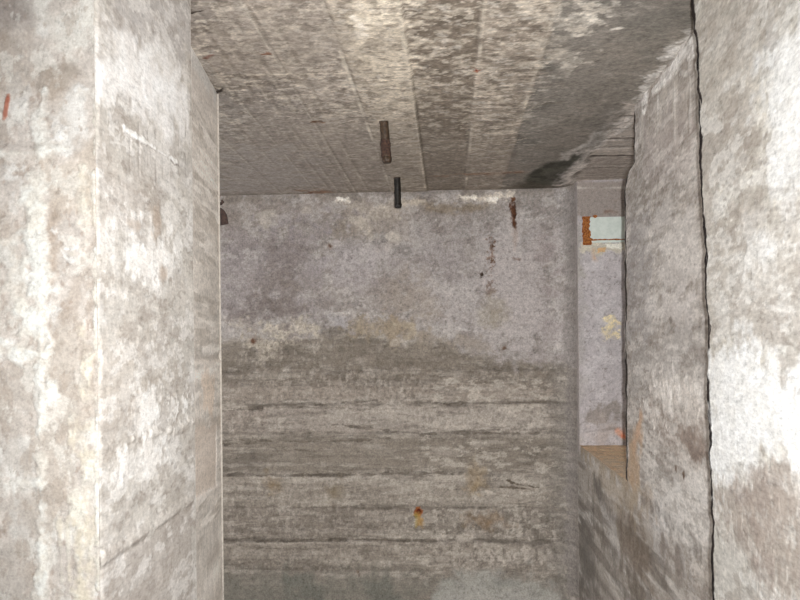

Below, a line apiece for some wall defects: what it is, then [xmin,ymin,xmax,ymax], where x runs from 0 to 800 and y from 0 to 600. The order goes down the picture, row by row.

rust [2,93,11,121]
rust [380,138,392,158]
rust [471,196,522,333]
water stain [489,0,697,190]
crack [624,111,636,482]
crack [691,0,712,348]
rust [412,506,426,530]
crack [707,378,715,600]